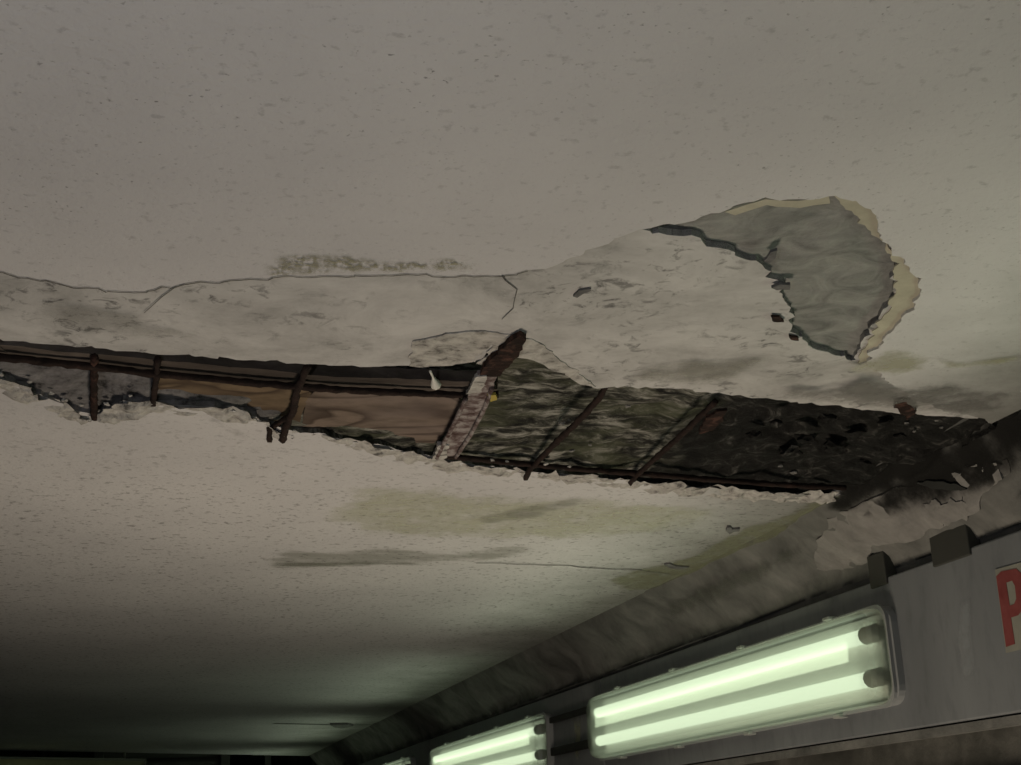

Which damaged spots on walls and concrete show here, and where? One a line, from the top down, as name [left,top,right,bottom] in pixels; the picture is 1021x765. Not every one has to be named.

crack [0,271,527,319]
peeling [0,196,1019,571]
damp [790,382,996,412]
damp [829,449,940,511]